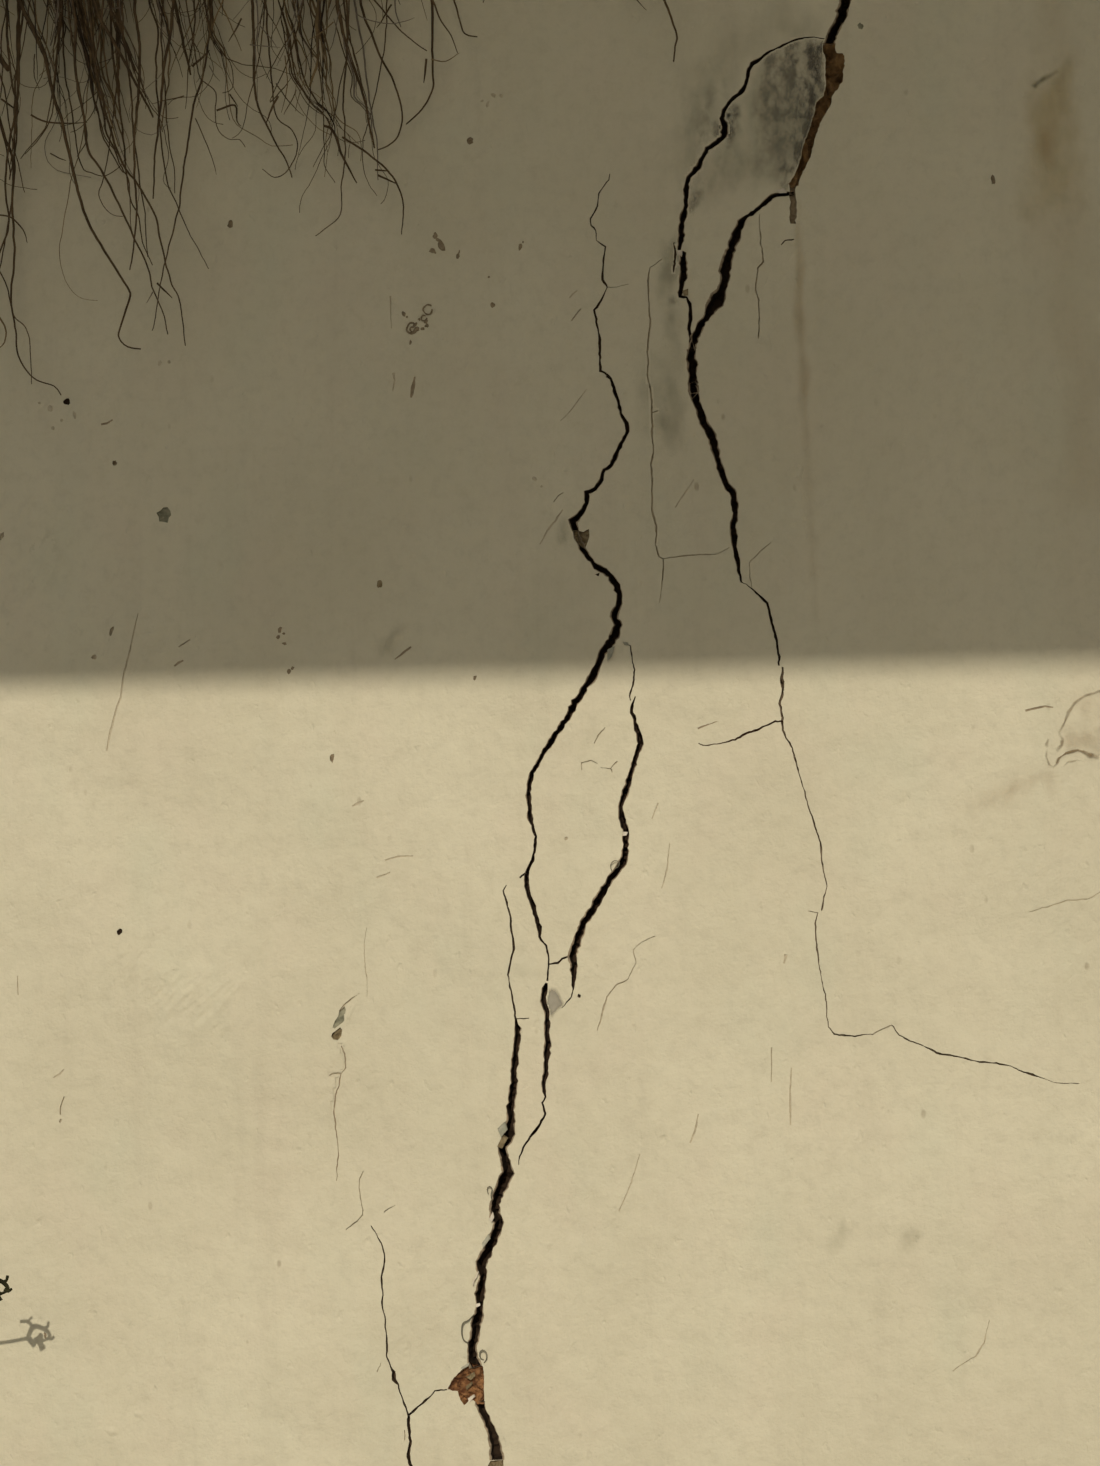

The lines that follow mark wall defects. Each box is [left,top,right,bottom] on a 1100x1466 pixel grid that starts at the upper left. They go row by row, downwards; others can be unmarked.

crack [329,0,1079,1466]
crack [1029,892,1100,912]